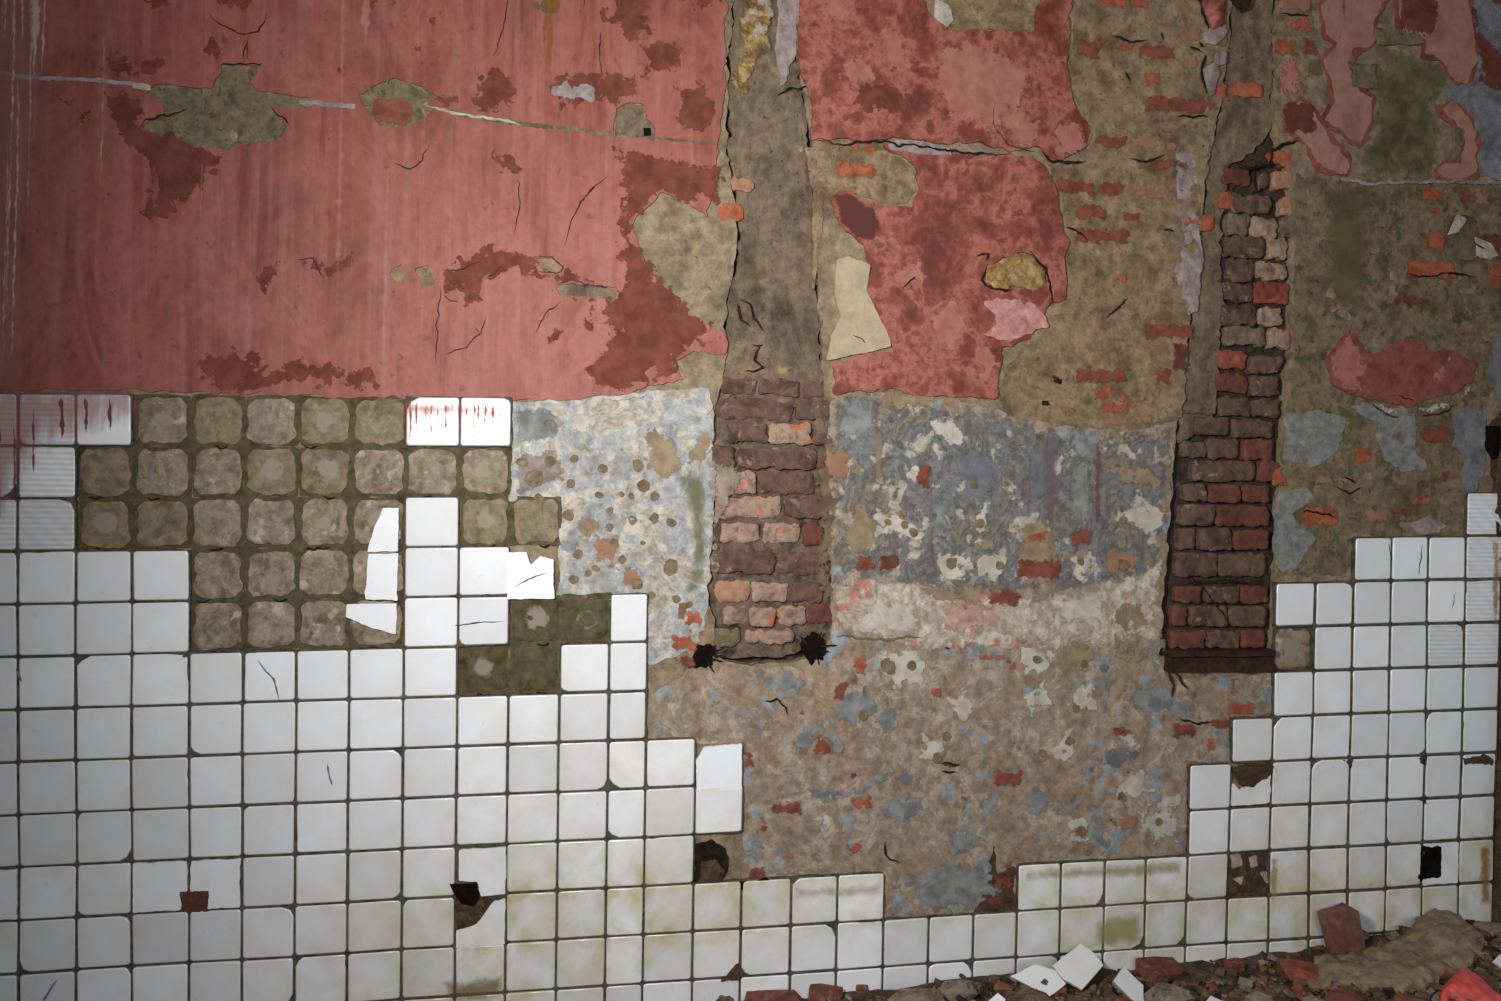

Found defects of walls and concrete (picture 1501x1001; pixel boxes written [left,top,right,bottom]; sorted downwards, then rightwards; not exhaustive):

spalling [58,32,307,222]
spalling [359,68,517,128]
crack [815,106,1086,164]
damp [3,0,46,333]
peeling [253,261,280,295]
peeling [299,251,353,278]
spalling [390,0,1501,923]
peeling [78,345,648,696]
spalling [133,858,241,916]
spalling [450,847,507,948]
spalling [1135,956,1188,983]